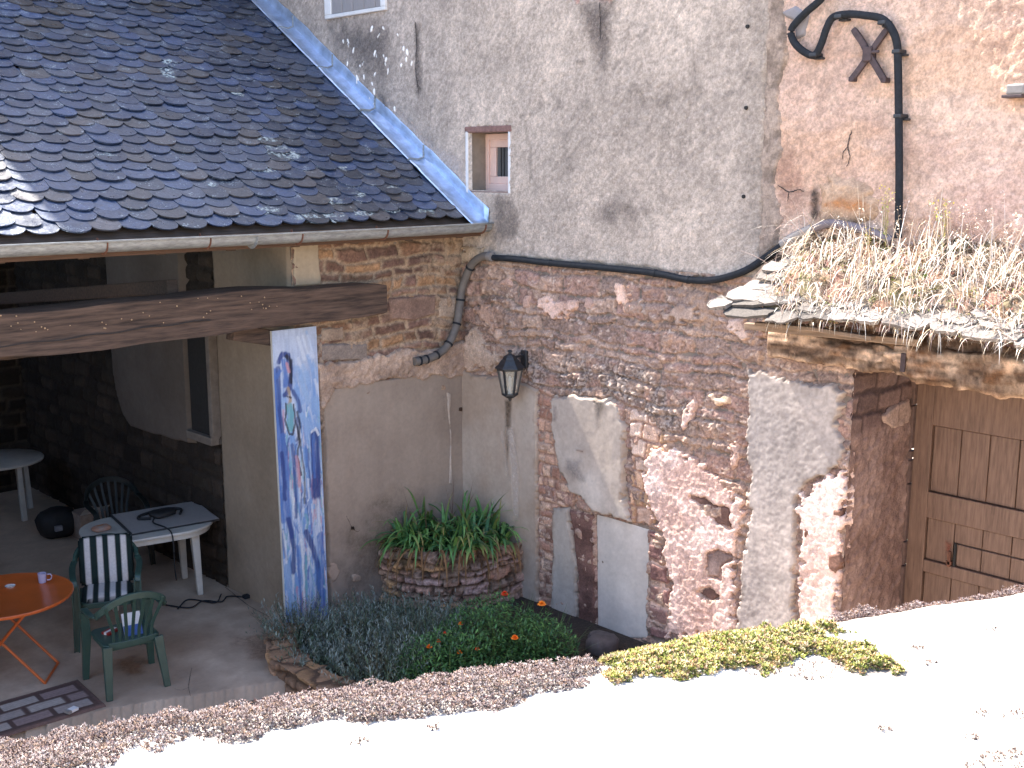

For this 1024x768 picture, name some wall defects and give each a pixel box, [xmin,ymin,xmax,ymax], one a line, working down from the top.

leakage [585,7,607,52]
flaking render [291,237,856,645]